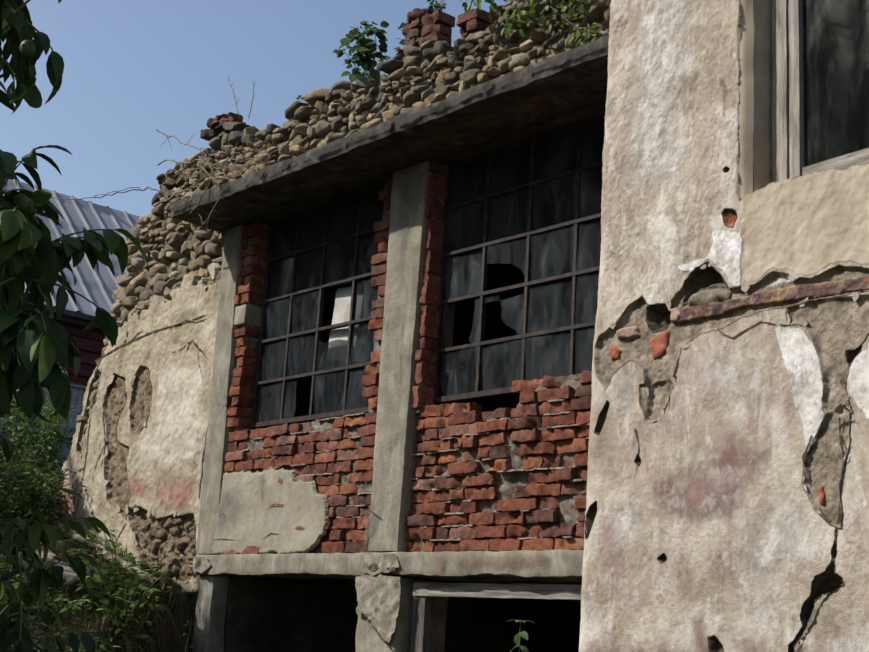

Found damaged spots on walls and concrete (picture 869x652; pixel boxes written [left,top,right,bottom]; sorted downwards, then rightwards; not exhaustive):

crack [68,315,208,517]
peeling [69,365,210,591]
spalling [223,545,261,555]
spalling [355,552,401,645]
spalling [594,208,869,528]
rust [679,277,869,324]
crack [788,410,856,652]